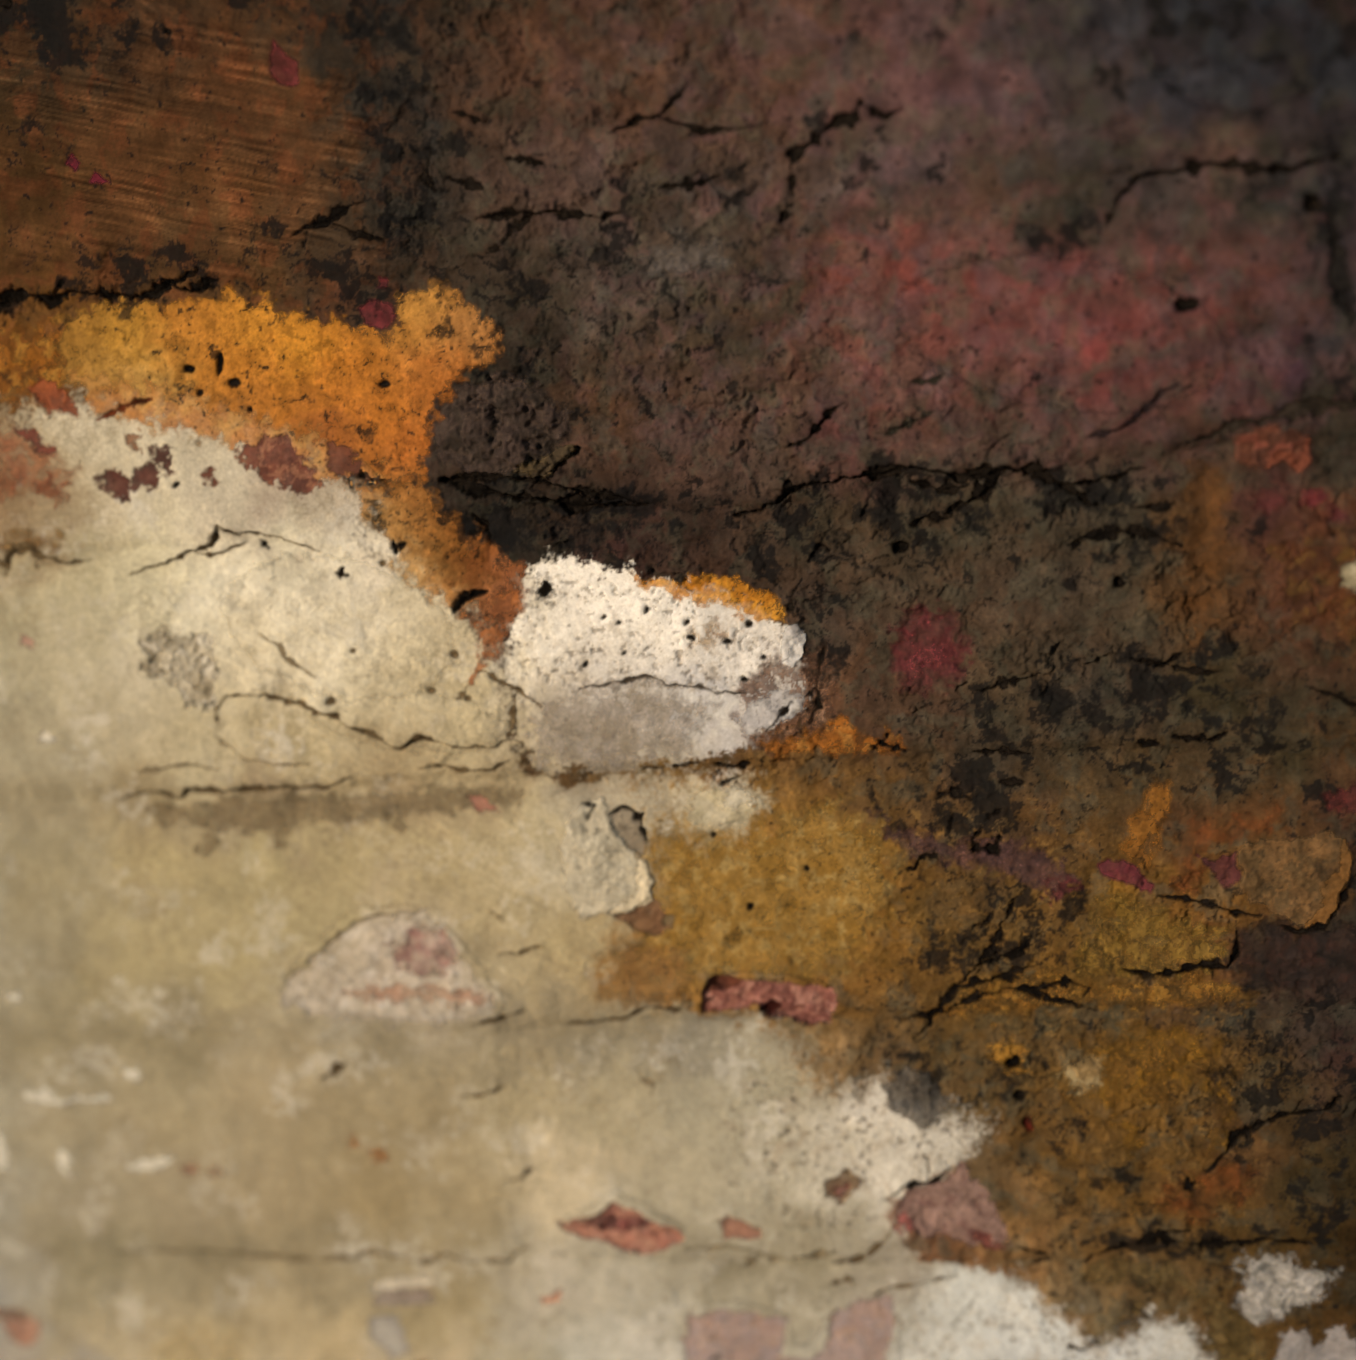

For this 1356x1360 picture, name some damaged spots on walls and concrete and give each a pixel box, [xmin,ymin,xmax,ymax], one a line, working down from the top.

corrosion [0,280,527,685]
crack [130,525,311,575]
crack [452,589,488,614]
crack [123,634,542,799]
crack [579,674,744,695]
corrosion [1119,782,1171,868]
peeling [281,904,505,1031]
spalling [702,971,838,1025]
corrosion [945,892,1256,1026]
corrosion [987,1043,1028,1075]
spalling [560,1187,684,1254]
peeling [894,1162,1012,1250]